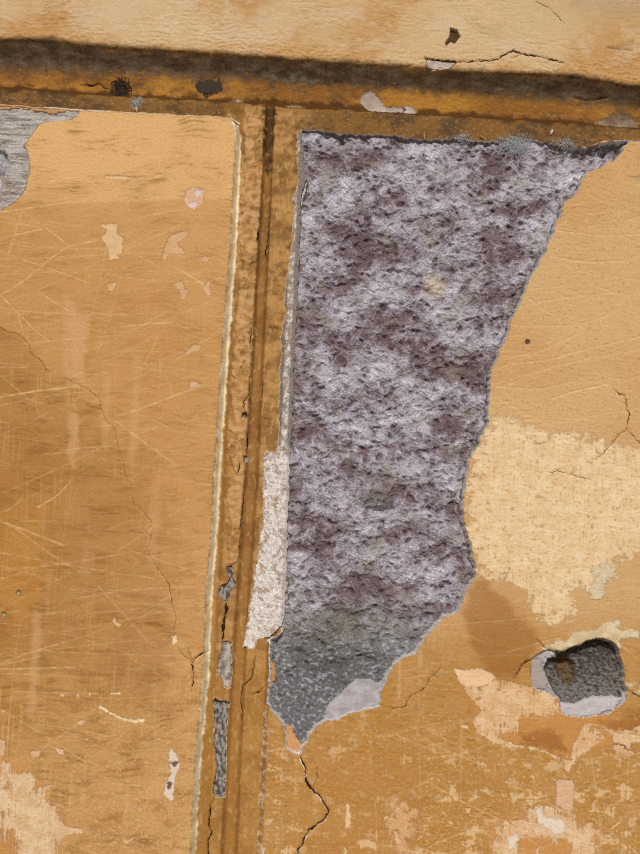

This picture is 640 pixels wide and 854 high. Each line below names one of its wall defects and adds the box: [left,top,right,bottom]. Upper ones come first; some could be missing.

crack [427,50,562,63]
spalling [0,105,80,210]
spalling [216,129,640,755]
crack [596,390,640,459]
crack [65,379,228,691]
peeling [0,739,84,854]
spalling [212,697,231,799]
crack [296,756,329,854]